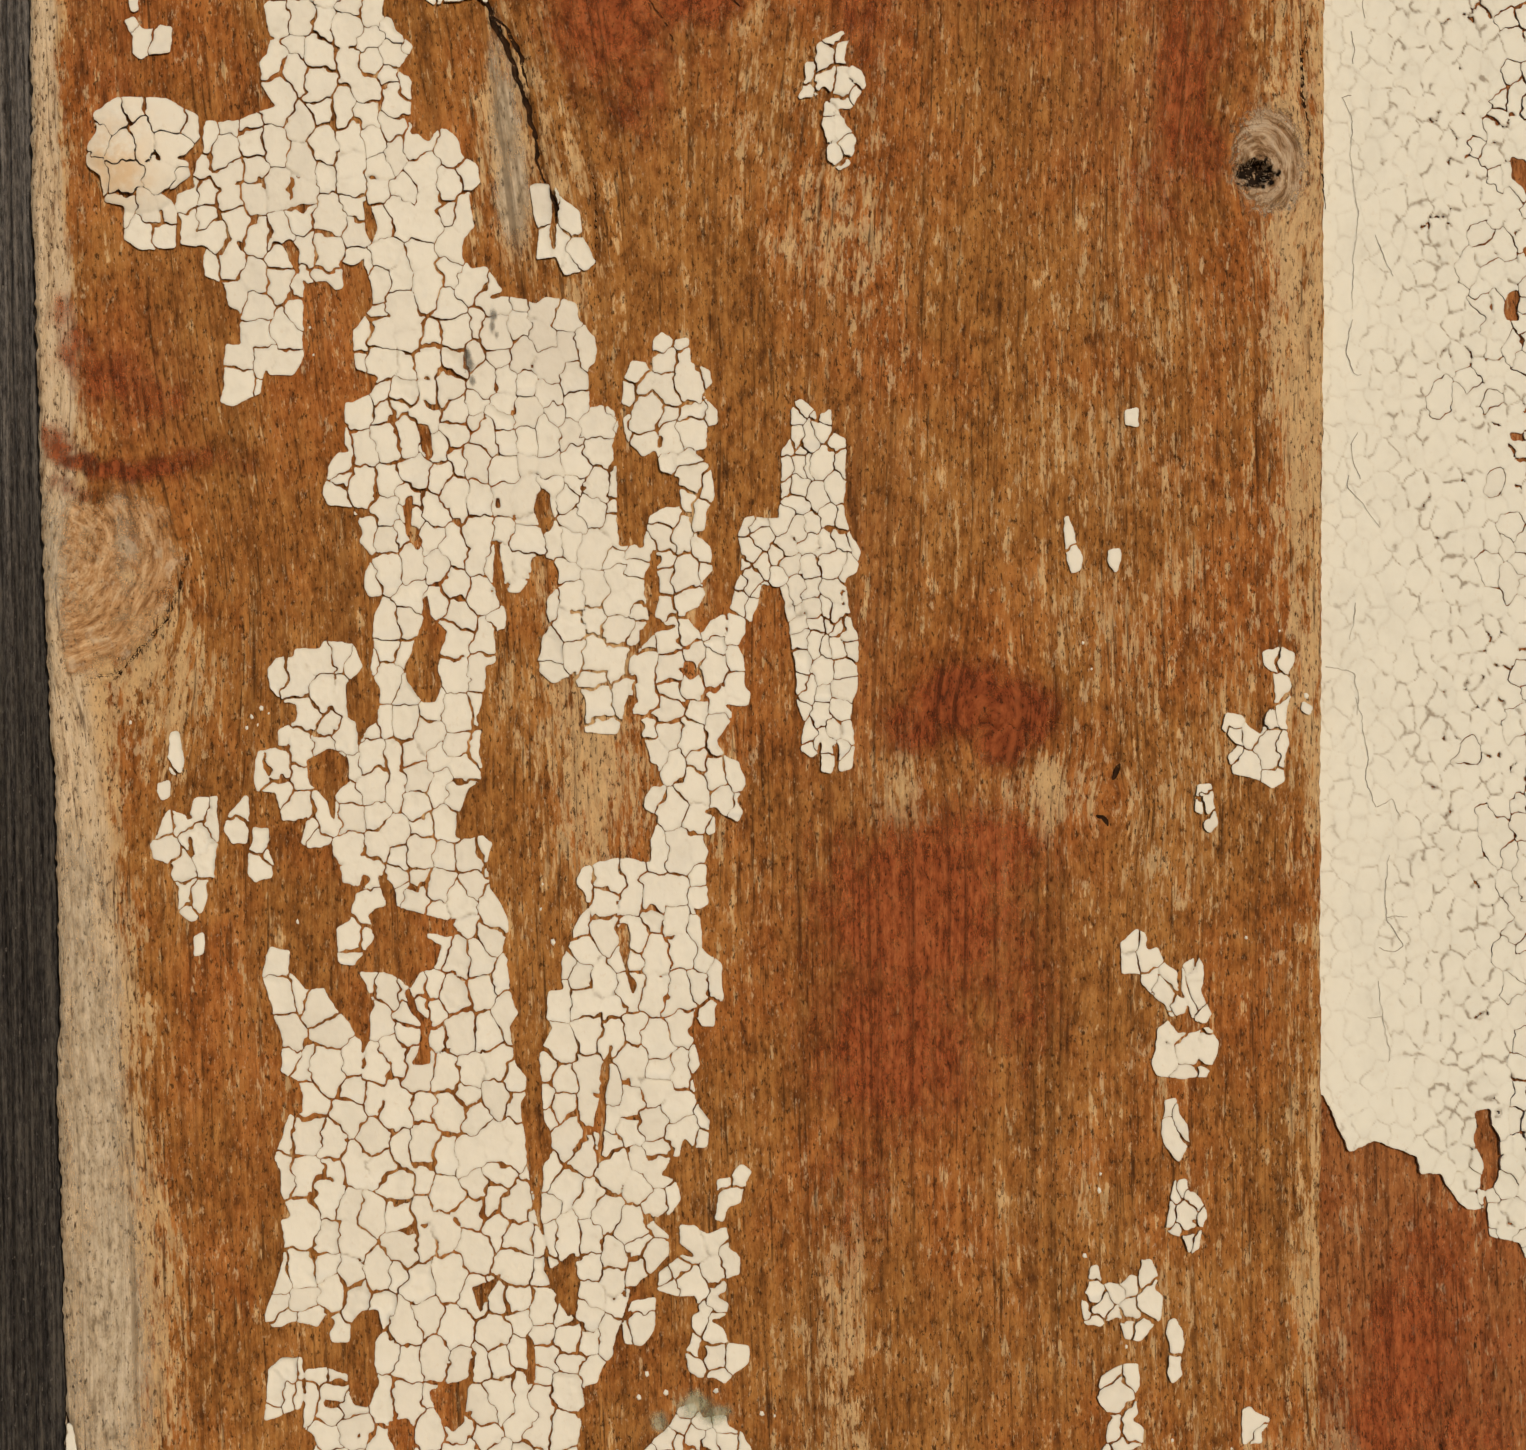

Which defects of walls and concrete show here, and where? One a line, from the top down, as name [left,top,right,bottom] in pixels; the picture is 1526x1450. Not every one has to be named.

crack [483,1,559,223]
crack [590,173,598,276]
crack [1300,0,1393,376]
crack [1347,432,1380,528]
crack [84,542,187,687]
peeling [1222,0,1526,1258]
peeling [150,0,866,1450]
crack [1325,603,1401,817]
peeling [1120,929,1219,1079]
peeling [1166,1179,1207,1253]
peeling [1081,1259,1184,1383]
peeling [1097,1363,1144,1450]